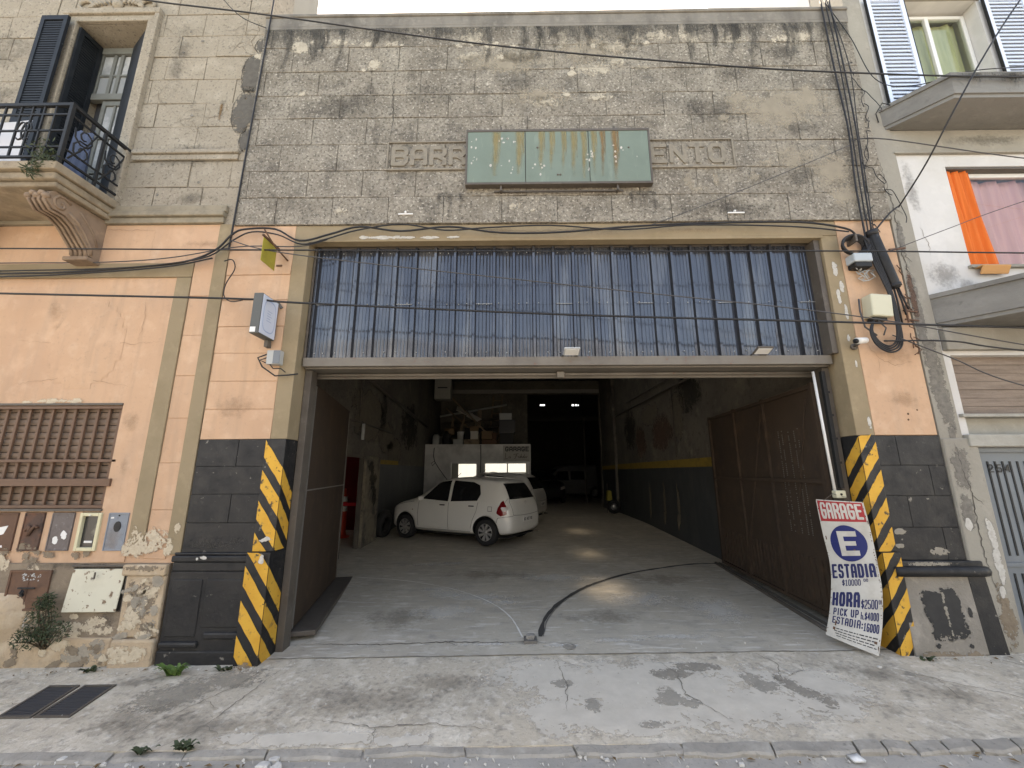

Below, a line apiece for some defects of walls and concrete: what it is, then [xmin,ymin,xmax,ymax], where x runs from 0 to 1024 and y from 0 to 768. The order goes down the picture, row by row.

flaking render [230,39,263,150]
flaking render [896,221,1019,657]
peeling [0,543,54,571]
peeling [38,523,181,668]
flaking render [3,646,17,668]